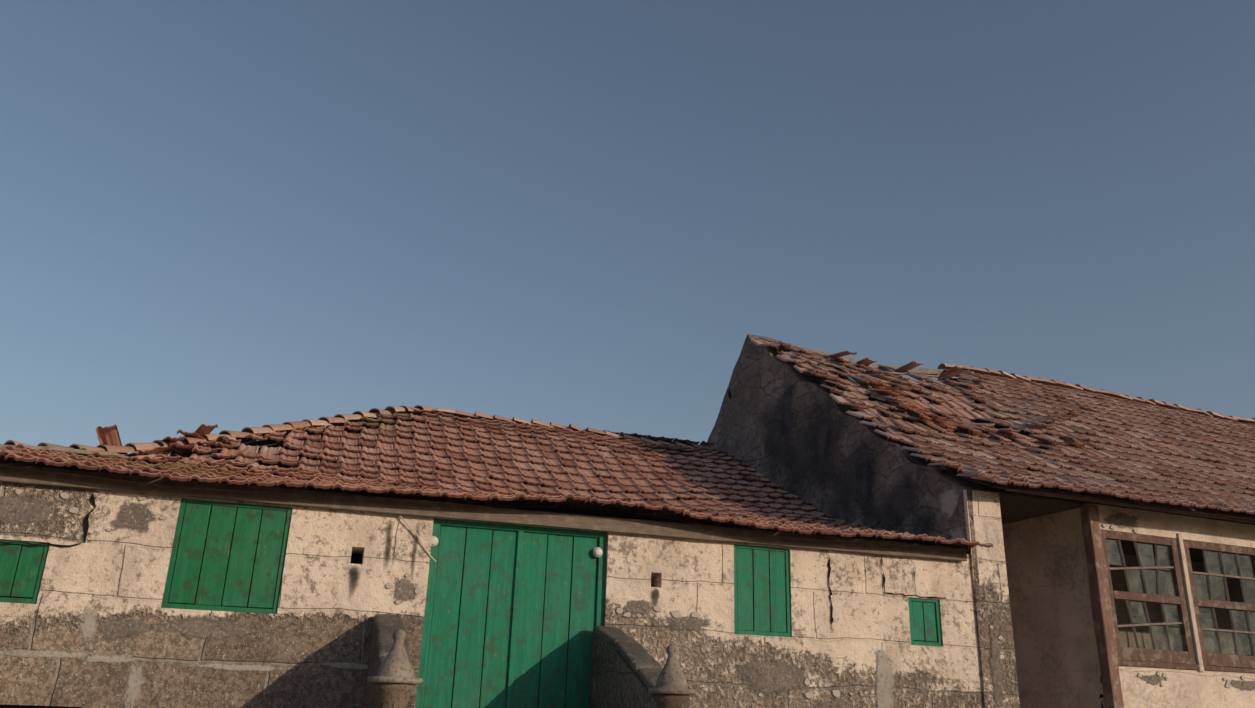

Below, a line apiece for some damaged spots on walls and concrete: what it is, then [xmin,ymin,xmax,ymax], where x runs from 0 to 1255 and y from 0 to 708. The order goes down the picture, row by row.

crack [68,494,96,546]
peeling [106,493,167,532]